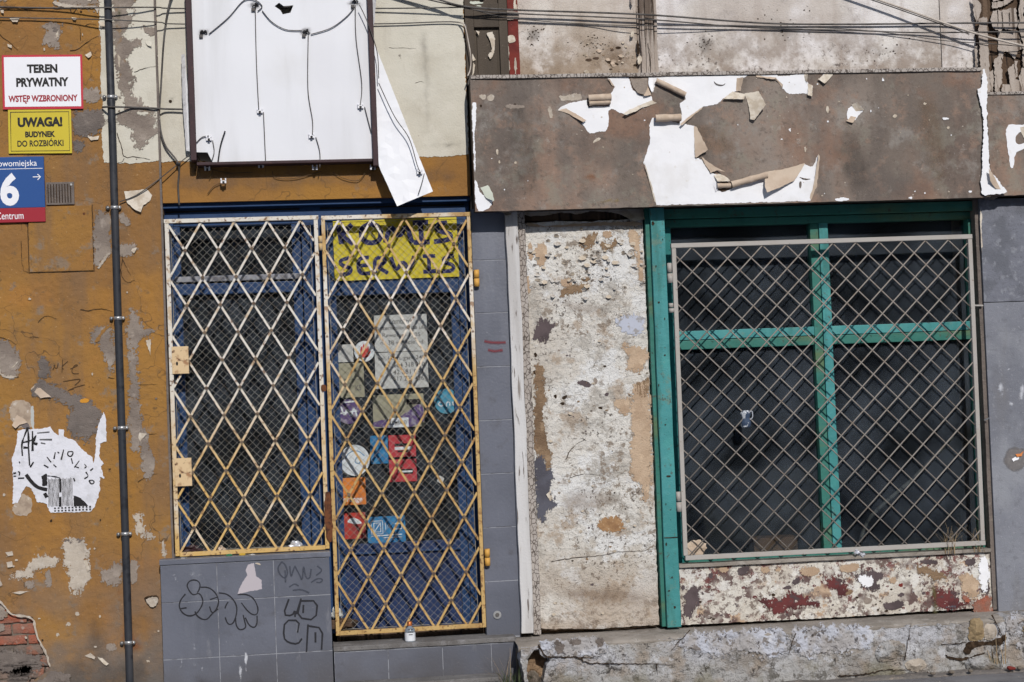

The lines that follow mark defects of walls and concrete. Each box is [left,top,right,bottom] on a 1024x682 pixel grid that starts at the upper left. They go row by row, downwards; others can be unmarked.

peeling [42,0,158,154]
peeling [477,31,495,59]
peeling [548,42,849,205]
peeling [1006,124,1024,168]
peeling [31,356,105,445]
peeling [90,306,157,481]
peeling [532,316,571,528]
peeling [593,336,666,503]
peeling [0,536,140,598]
peeling [579,508,636,538]
peeling [668,556,1007,655]
spalling [521,638,582,682]